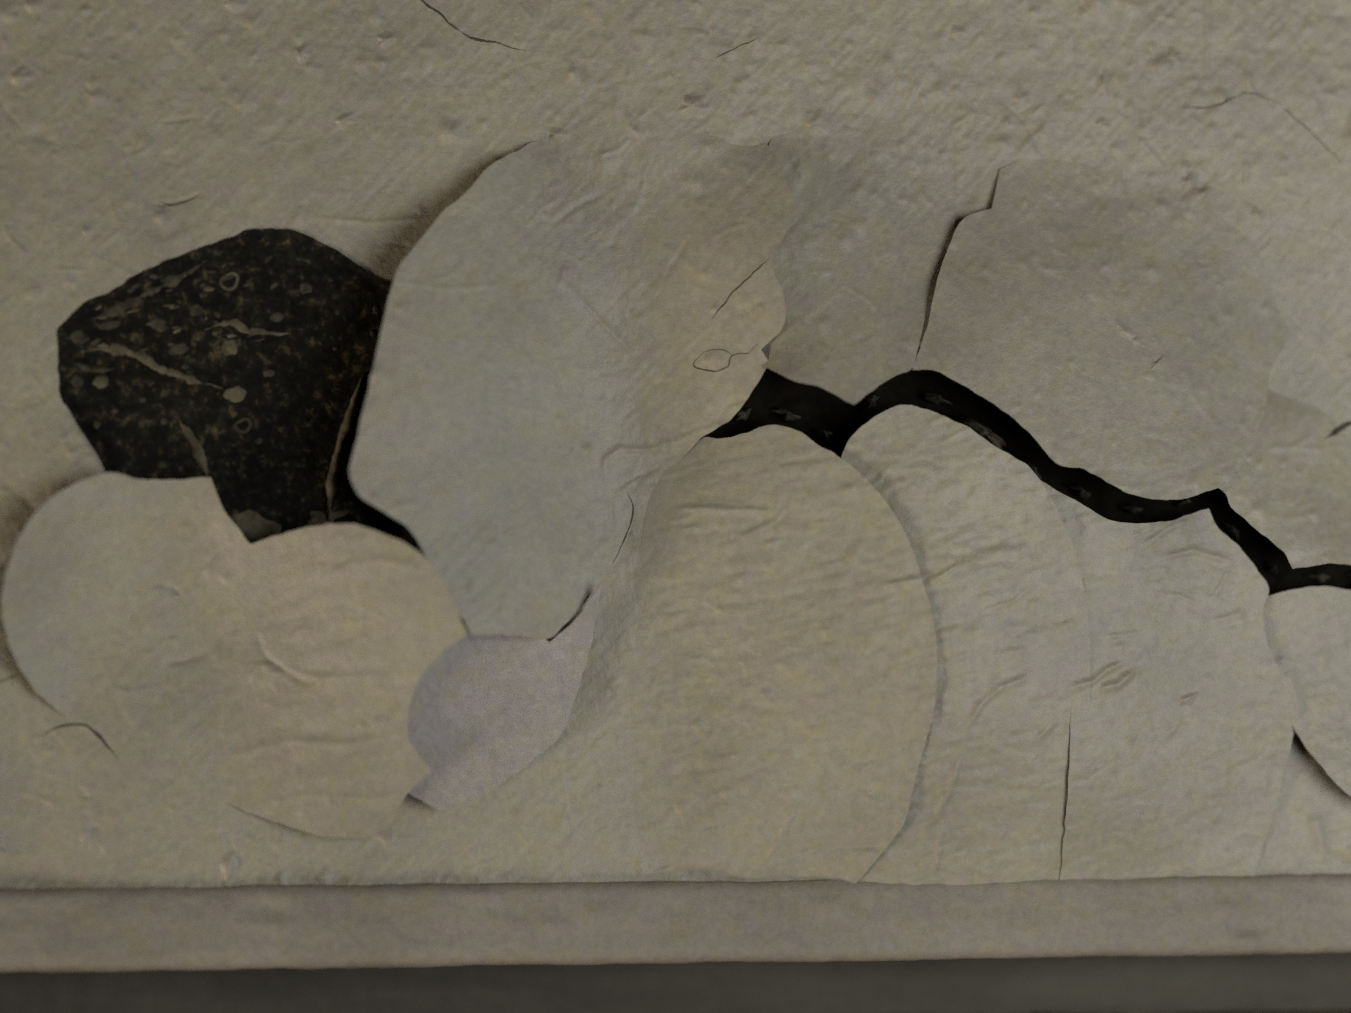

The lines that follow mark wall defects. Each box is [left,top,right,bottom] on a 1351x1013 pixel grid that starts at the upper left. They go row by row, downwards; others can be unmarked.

crack [714,258,770,316]
peeling [0,112,1351,885]
crack [693,346,1351,596]